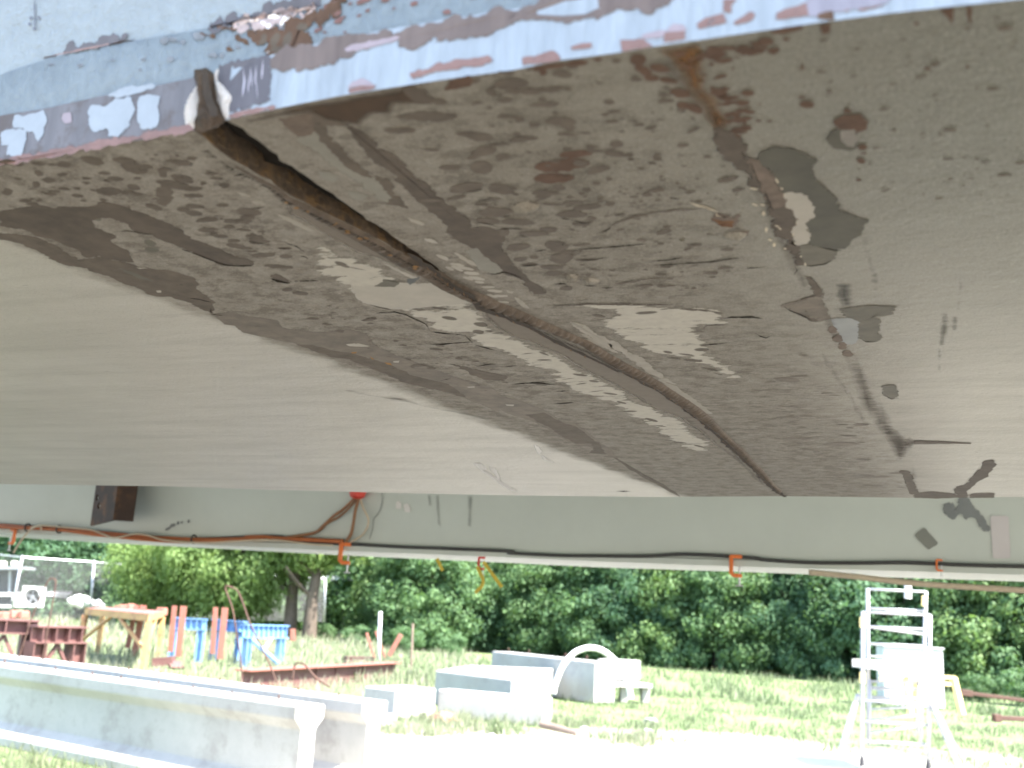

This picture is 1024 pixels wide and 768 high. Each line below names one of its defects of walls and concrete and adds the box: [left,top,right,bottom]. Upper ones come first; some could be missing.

peeling [43,33,134,68]
peeling [87,83,160,137]
peeling [208,0,747,309]
rust [522,43,602,75]
rust [620,0,806,273]
rust [759,2,834,42]
rust [826,109,869,164]
damp [290,205,411,272]
peeling [0,110,711,460]
peeling [758,147,897,345]
damp [485,313,739,460]
peeling [560,303,744,414]